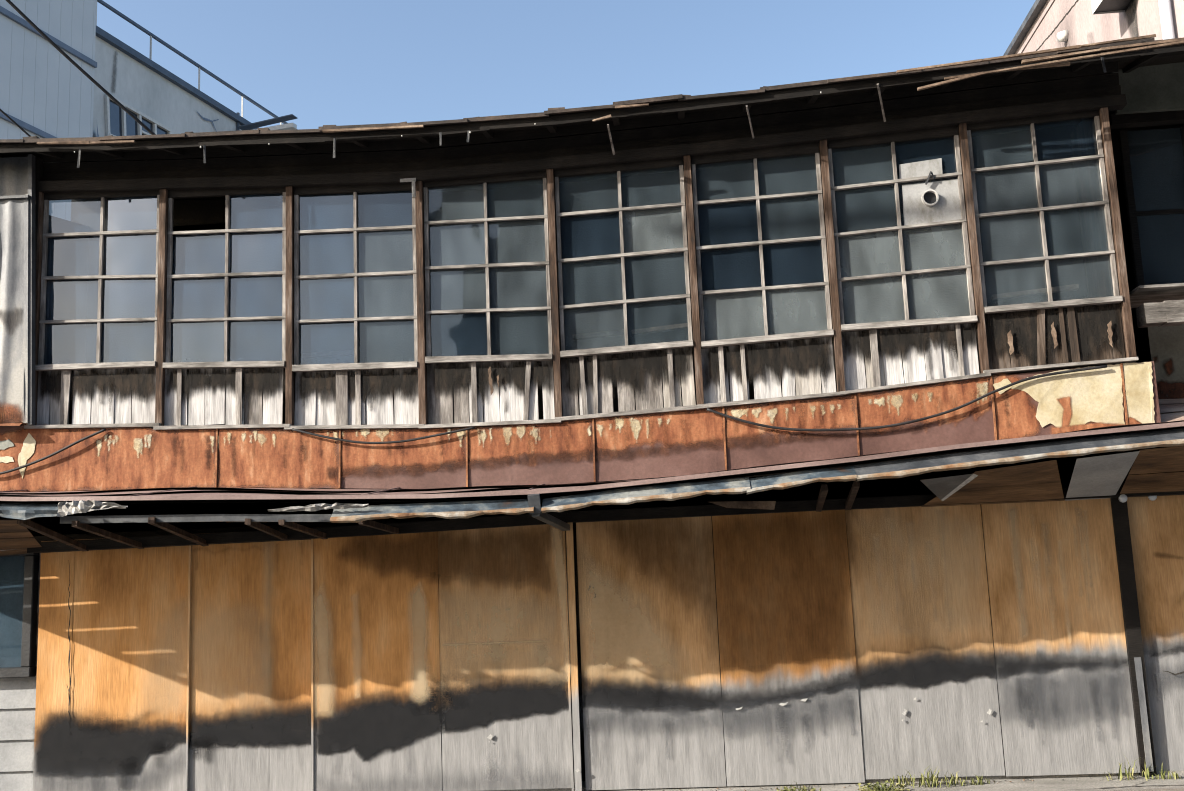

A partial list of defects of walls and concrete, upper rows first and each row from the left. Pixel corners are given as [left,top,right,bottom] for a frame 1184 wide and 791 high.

peeling [0,433,36,479]
rust [0,374,1141,493]
damp [40,303,1123,410]
peeling [869,392,932,415]
peeling [977,362,1155,428]
rust [1154,356,1184,399]
damp [343,529,568,660]
damp [35,591,1126,784]